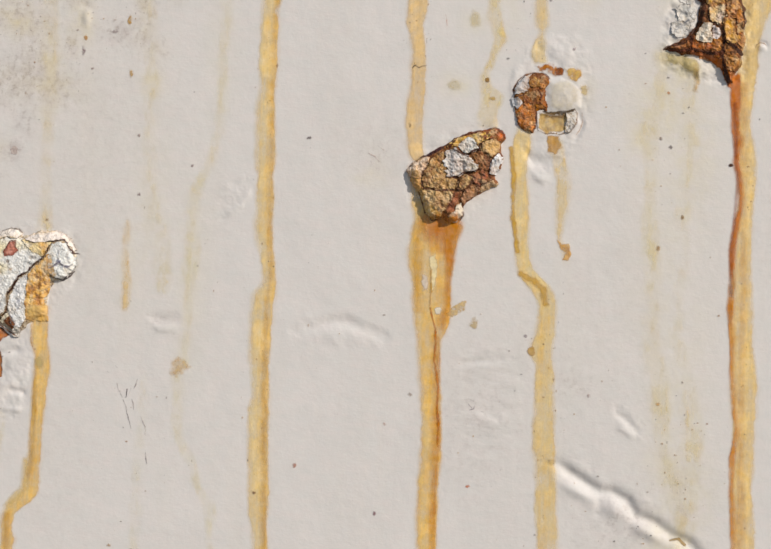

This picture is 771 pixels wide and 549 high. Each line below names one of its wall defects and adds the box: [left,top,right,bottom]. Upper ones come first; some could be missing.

corrosion [406,0,428,160]
peeling [398,30,598,235]
peeling [655,0,752,94]
peeling [0,217,89,425]
corrosion [409,171,466,549]
corrosion [727,0,771,549]